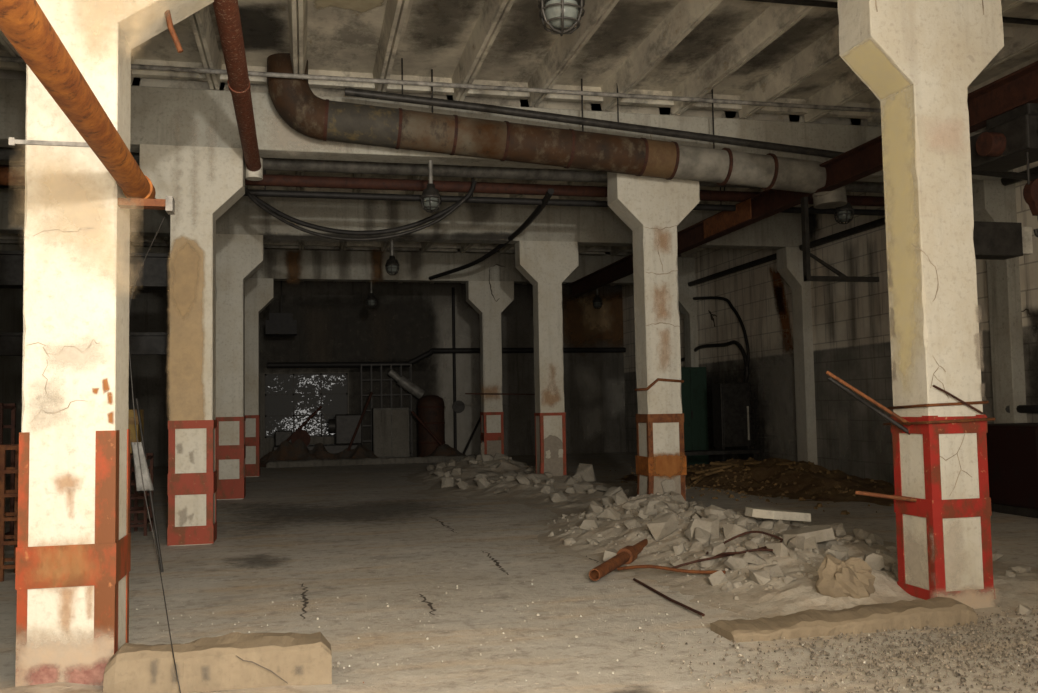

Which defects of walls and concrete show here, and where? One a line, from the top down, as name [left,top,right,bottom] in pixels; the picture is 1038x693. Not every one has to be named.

crack [940,434,972,497]
crack [482,551,509,575]
crack [300,583,309,619]
crack [419,594,436,615]